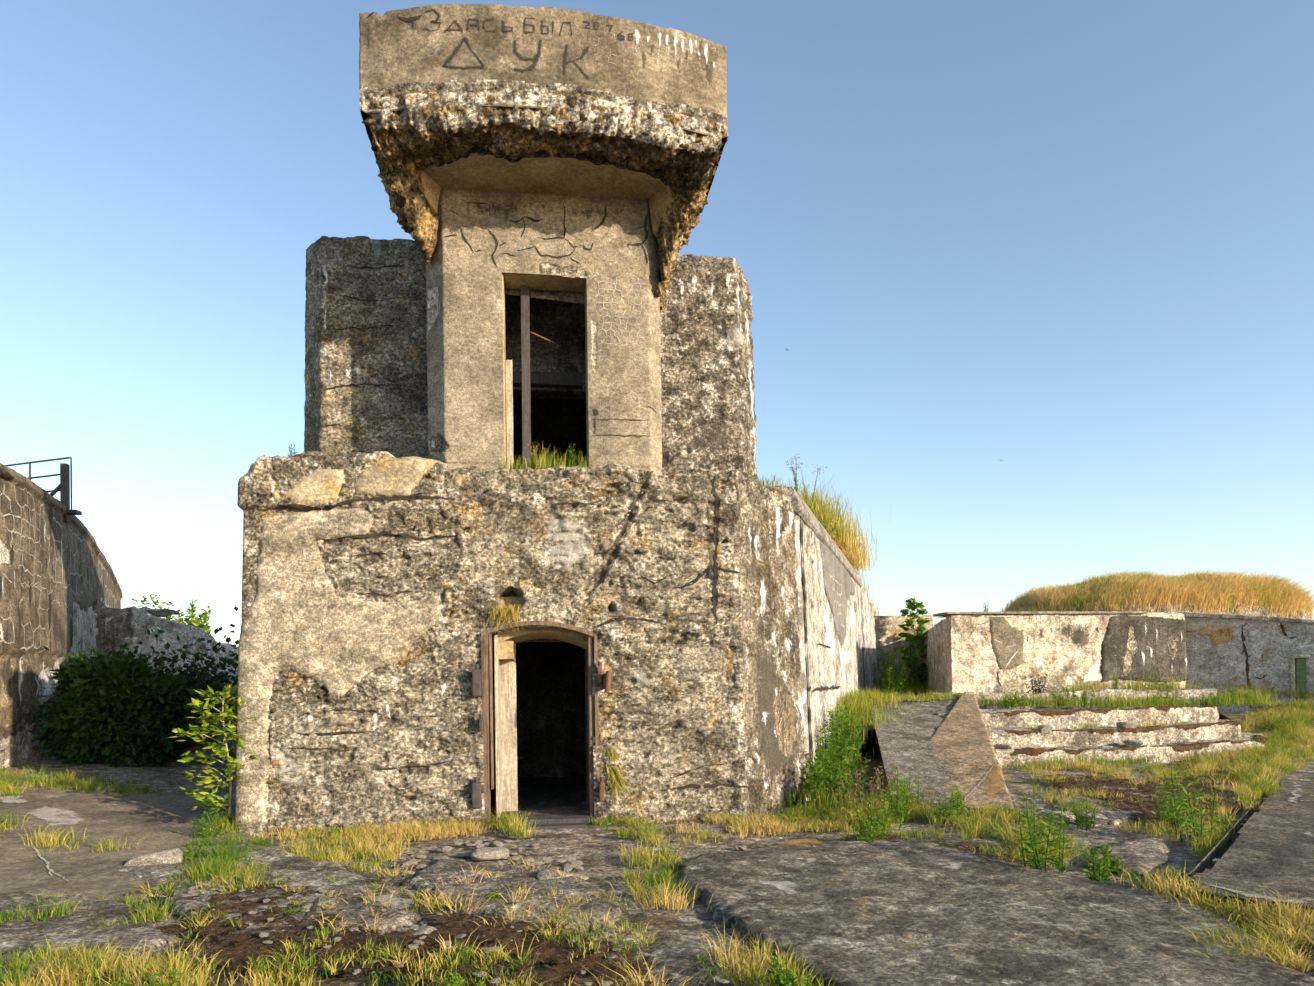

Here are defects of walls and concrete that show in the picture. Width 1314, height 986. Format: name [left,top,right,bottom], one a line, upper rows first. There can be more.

spalling [359,80,728,186]
crack [426,148,666,185]
crack [329,264,405,330]
crack [445,202,649,346]
spalling [539,262,588,278]
crack [322,383,403,391]
spalling [0,540,11,565]
peeling [235,434,734,830]
spalling [0,602,98,769]